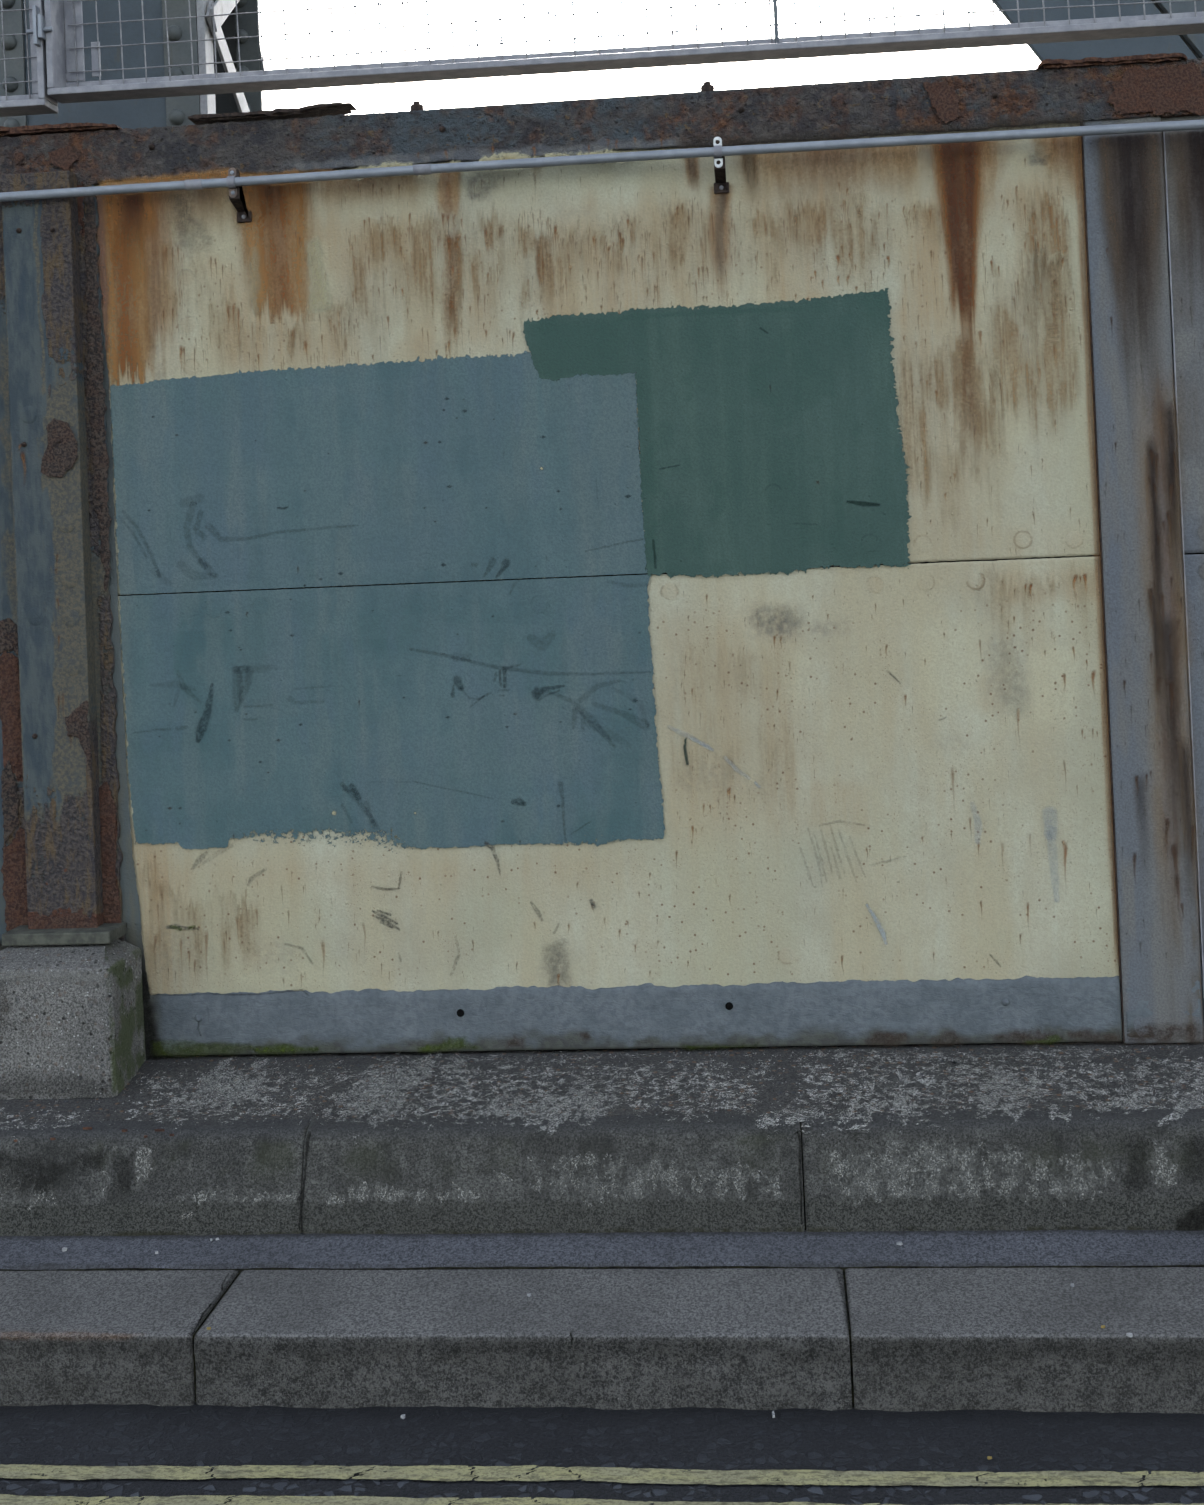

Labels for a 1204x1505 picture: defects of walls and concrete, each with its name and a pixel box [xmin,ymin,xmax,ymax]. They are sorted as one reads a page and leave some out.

rust [1037,53,1187,70]
rust [0,123,122,138]
rust [188,102,358,125]
rust [96,169,339,386]
rust [355,172,498,355]
rust [682,113,1088,491]
water stain [135,1146,152,1183]
water stain [326,1181,480,1205]
water stain [493,1153,782,1207]
water stain [830,1136,1115,1206]
water stain [1152,1143,1178,1187]
water stain [1176,1205,1204,1231]